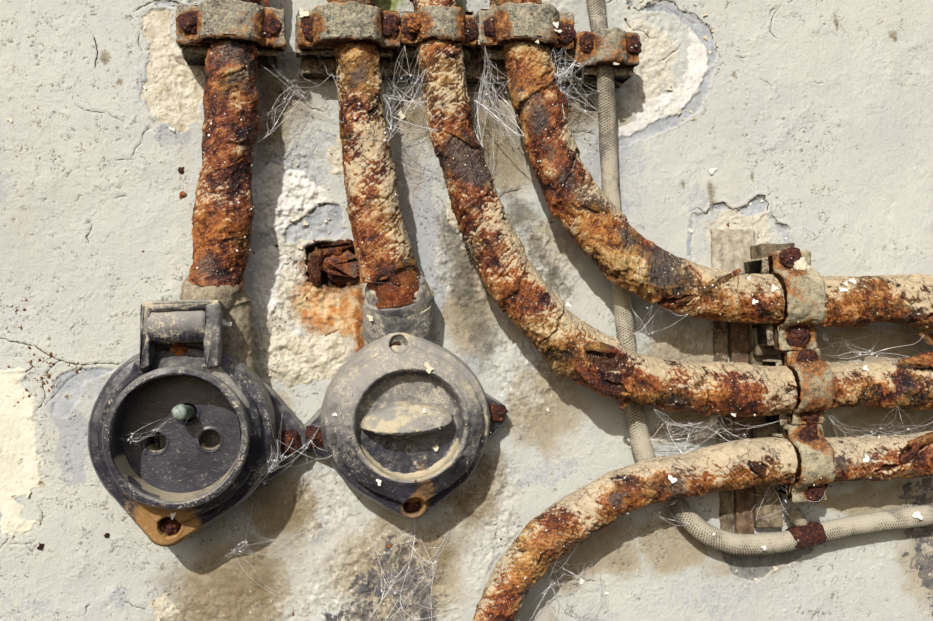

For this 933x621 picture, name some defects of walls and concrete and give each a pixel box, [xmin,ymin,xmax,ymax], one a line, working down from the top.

spalling [140,1,206,133]
peeling [616,0,719,150]
spalling [712,197,767,216]
corrosion [291,261,365,352]
peeling [0,367,45,539]
water stain [897,478,933,507]
water stain [902,525,933,615]